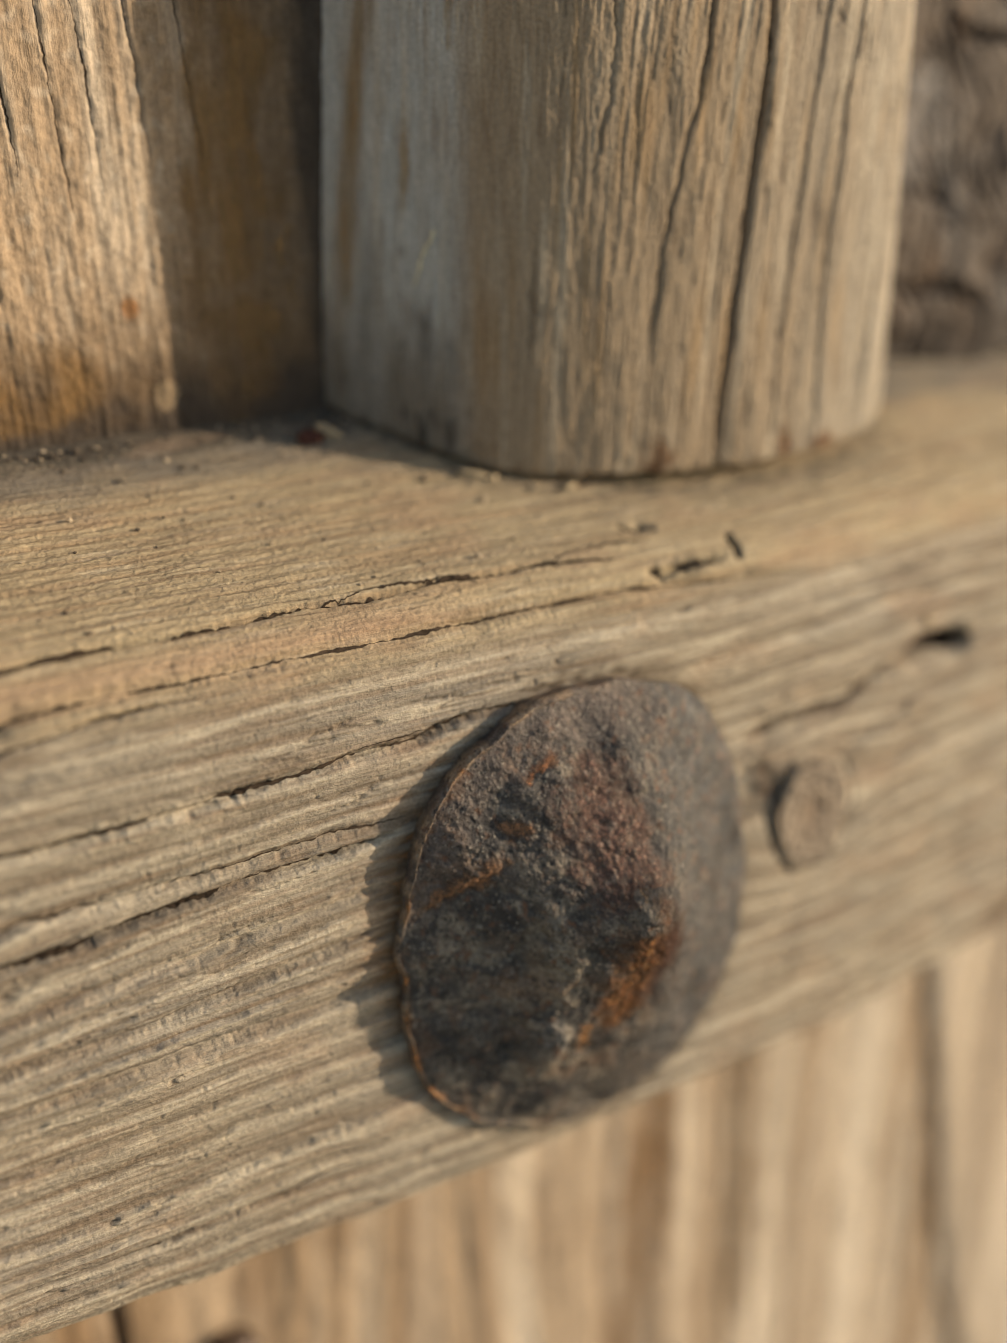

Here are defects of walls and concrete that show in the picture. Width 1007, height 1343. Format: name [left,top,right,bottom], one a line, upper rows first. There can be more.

crack [0,87,18,171]
crack [32,0,78,234]
crack [68,0,108,196]
crack [121,0,151,168]
crack [172,0,207,200]
crack [647,0,724,374]
crack [764,0,787,67]
crack [0,539,809,757]
crack [743,660,892,740]
corrosion [384,832,501,928]
corrosion [563,754,684,1044]